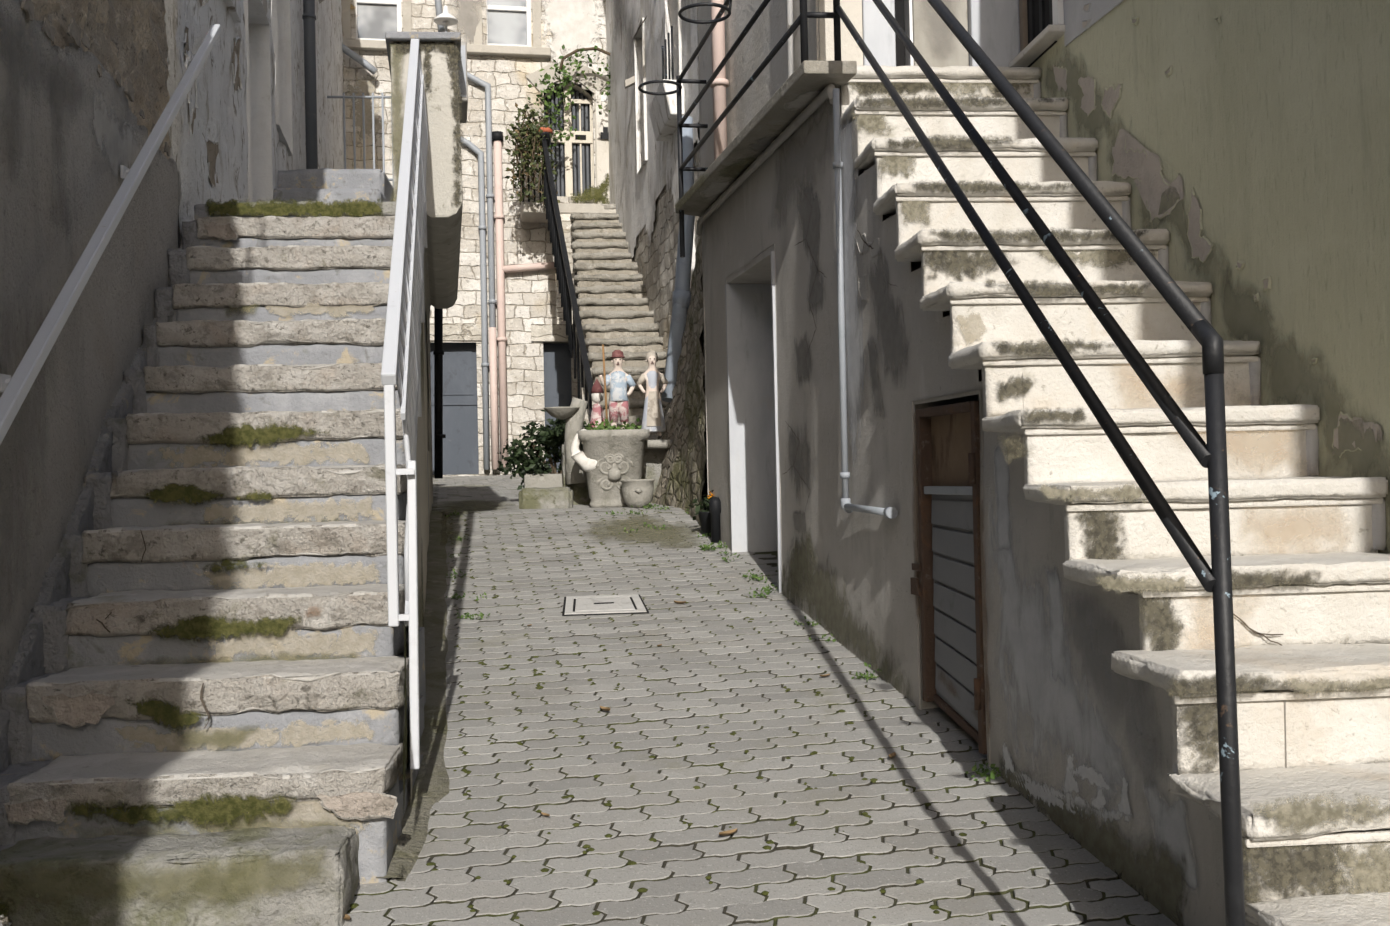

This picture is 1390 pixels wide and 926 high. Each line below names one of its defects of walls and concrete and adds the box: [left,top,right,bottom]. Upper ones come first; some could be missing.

flaking render [21,0,219,188]
peeling [1053,65,1215,263]
leakage [776,101,865,458]
leakage [790,533,813,594]
crack [1233,613,1283,646]